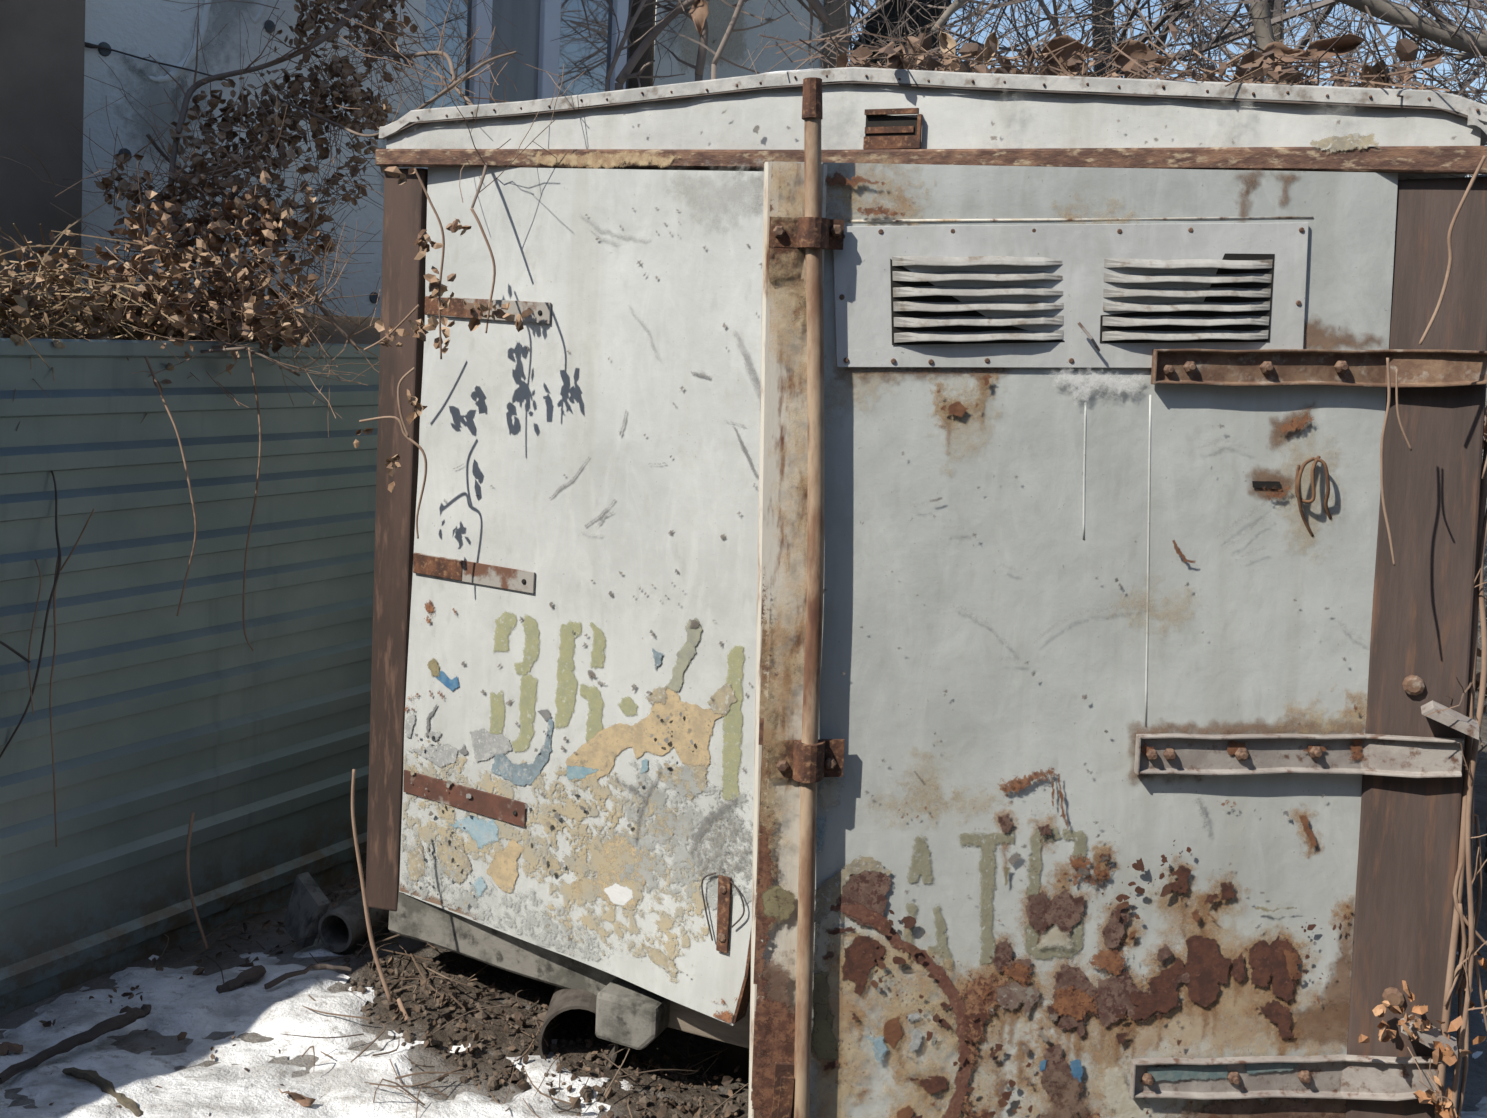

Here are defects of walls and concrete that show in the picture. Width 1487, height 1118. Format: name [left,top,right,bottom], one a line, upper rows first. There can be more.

corrosion [769,160,807,359]
corrosion [825,173,916,220]
corrosion [837,367,1005,432]
peeling [400,569,753,983]
corrosion [751,567,802,1118]
corrosion [1132,705,1367,761]
corrosion [810,767,1354,1118]